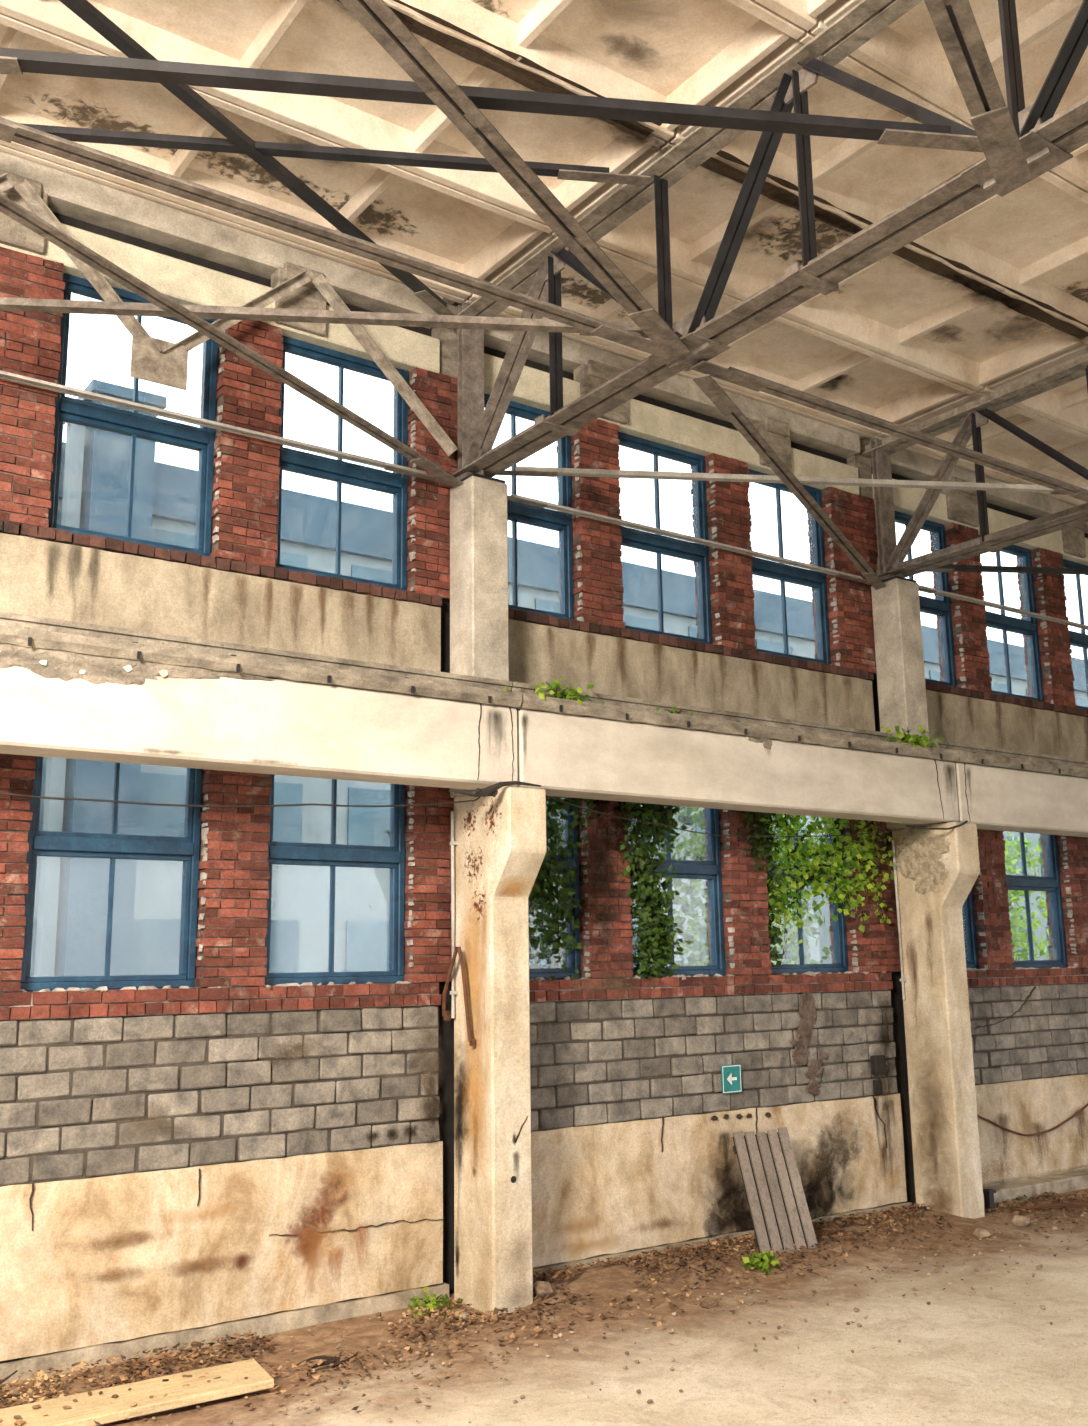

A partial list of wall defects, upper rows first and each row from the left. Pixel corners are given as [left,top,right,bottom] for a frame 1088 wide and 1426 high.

damp [49,546,97,591]
peeling [0,643,273,685]
damp [106,1233,148,1245]
corrosion [287,1184,346,1256]
crack [269,1219,443,1236]